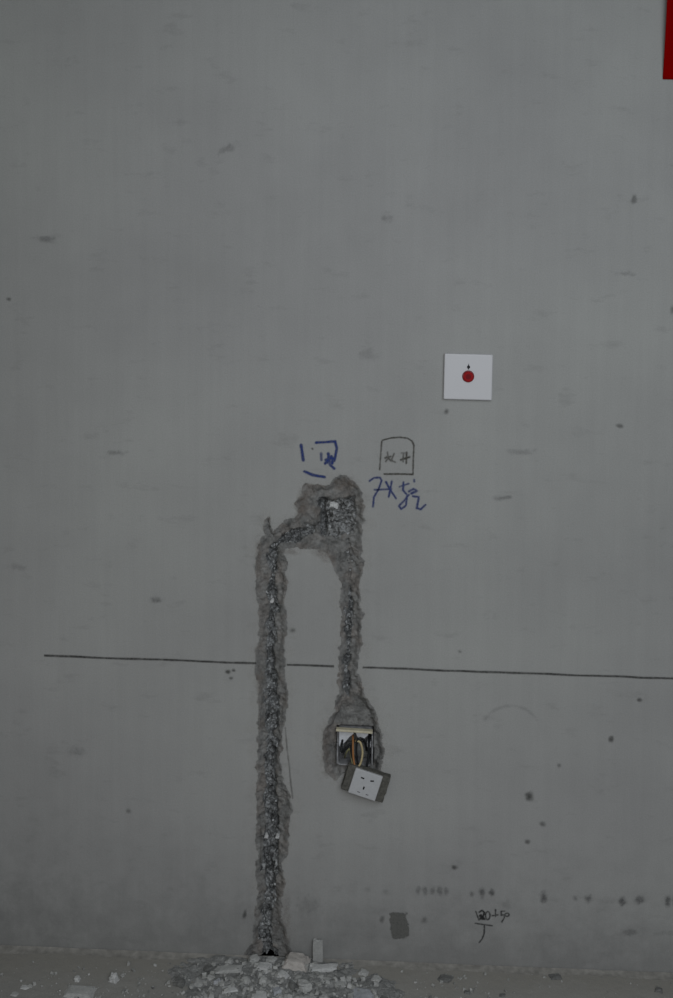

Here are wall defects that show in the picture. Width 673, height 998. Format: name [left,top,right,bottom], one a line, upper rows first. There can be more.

spalling [244,475,385,956]